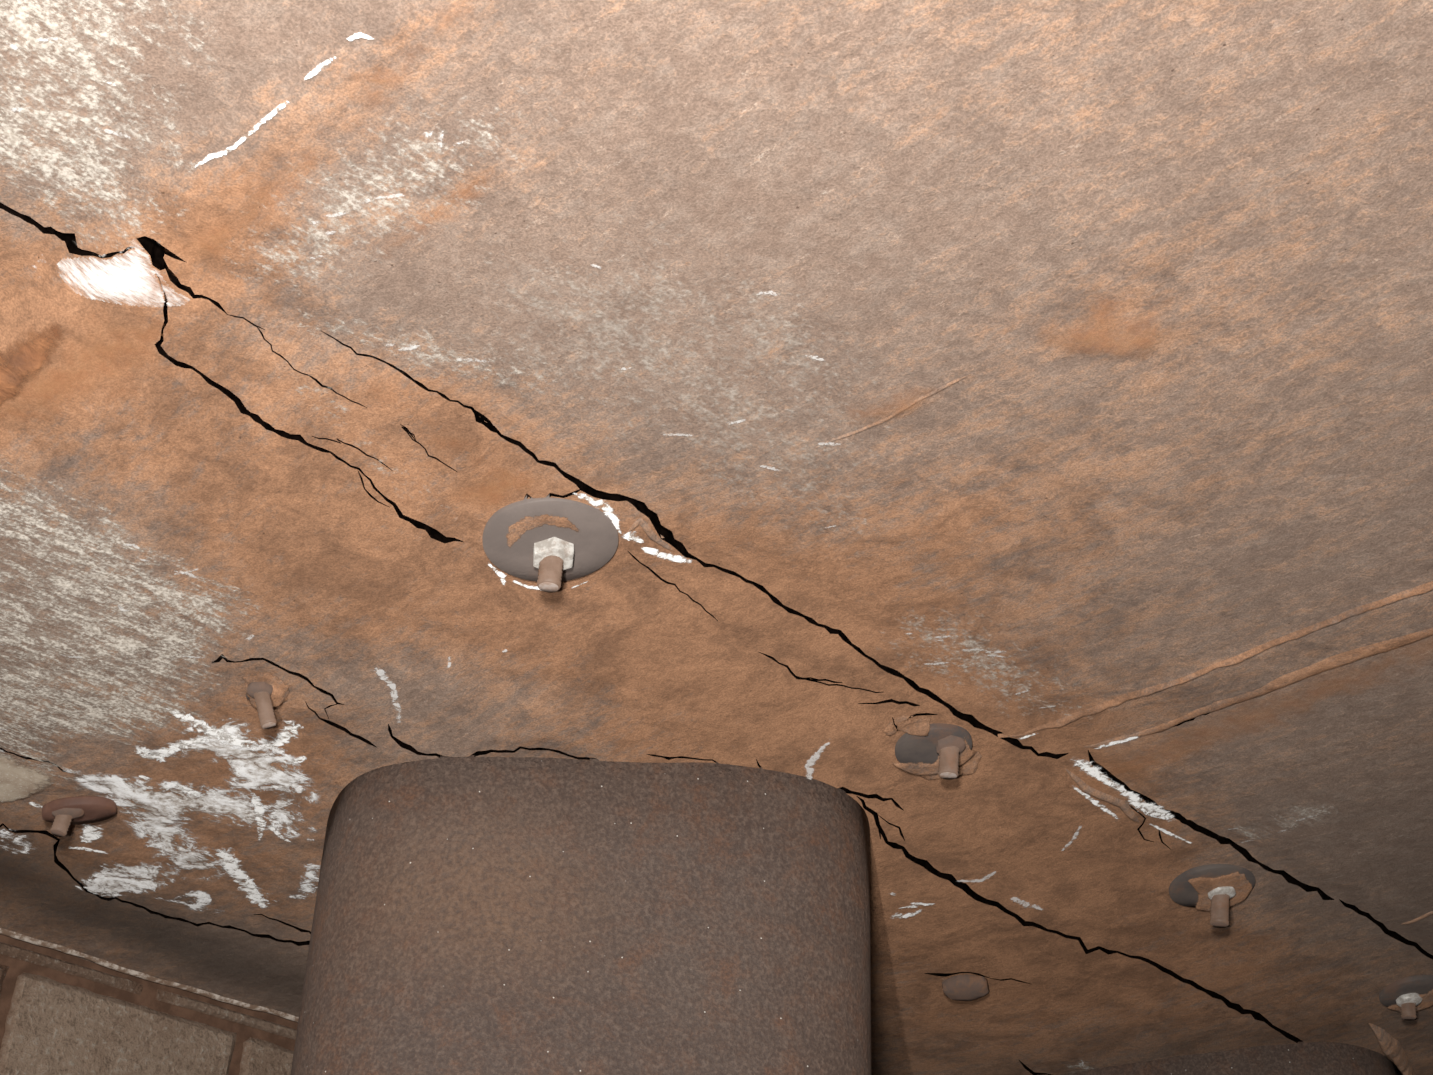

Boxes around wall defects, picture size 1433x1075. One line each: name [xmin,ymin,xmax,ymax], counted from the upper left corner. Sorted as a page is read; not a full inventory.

efflorescence [0,0,177,305]
spalling [136,236,187,270]
efflorescence [169,101,289,167]
efflorescence [305,57,336,80]
efflorescence [347,32,373,41]
efflorescence [264,143,457,278]
crack [0,202,463,543]
water stain [0,470,320,913]
crack [212,654,597,760]
crack [321,331,1433,959]
crack [0,823,311,946]
crack [840,787,1303,1043]